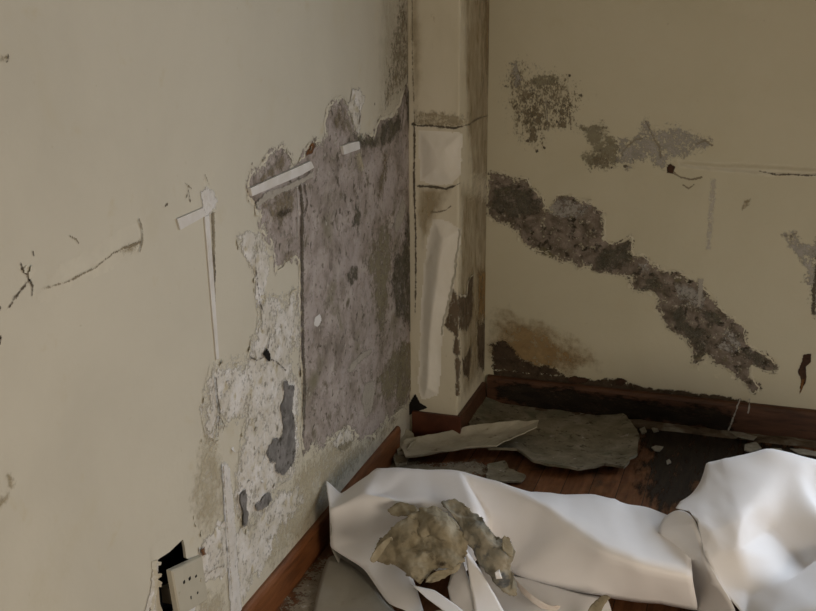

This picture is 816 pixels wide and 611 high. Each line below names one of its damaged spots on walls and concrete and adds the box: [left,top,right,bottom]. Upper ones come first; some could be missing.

damp [385,0,489,170]
damp [505,61,634,169]
crack [0,218,143,309]
flaking render [200,83,427,534]
damp [392,215,410,327]
damp [396,341,411,405]
damp [462,198,816,512]
rust [798,354,811,393]
spalling [145,506,230,611]